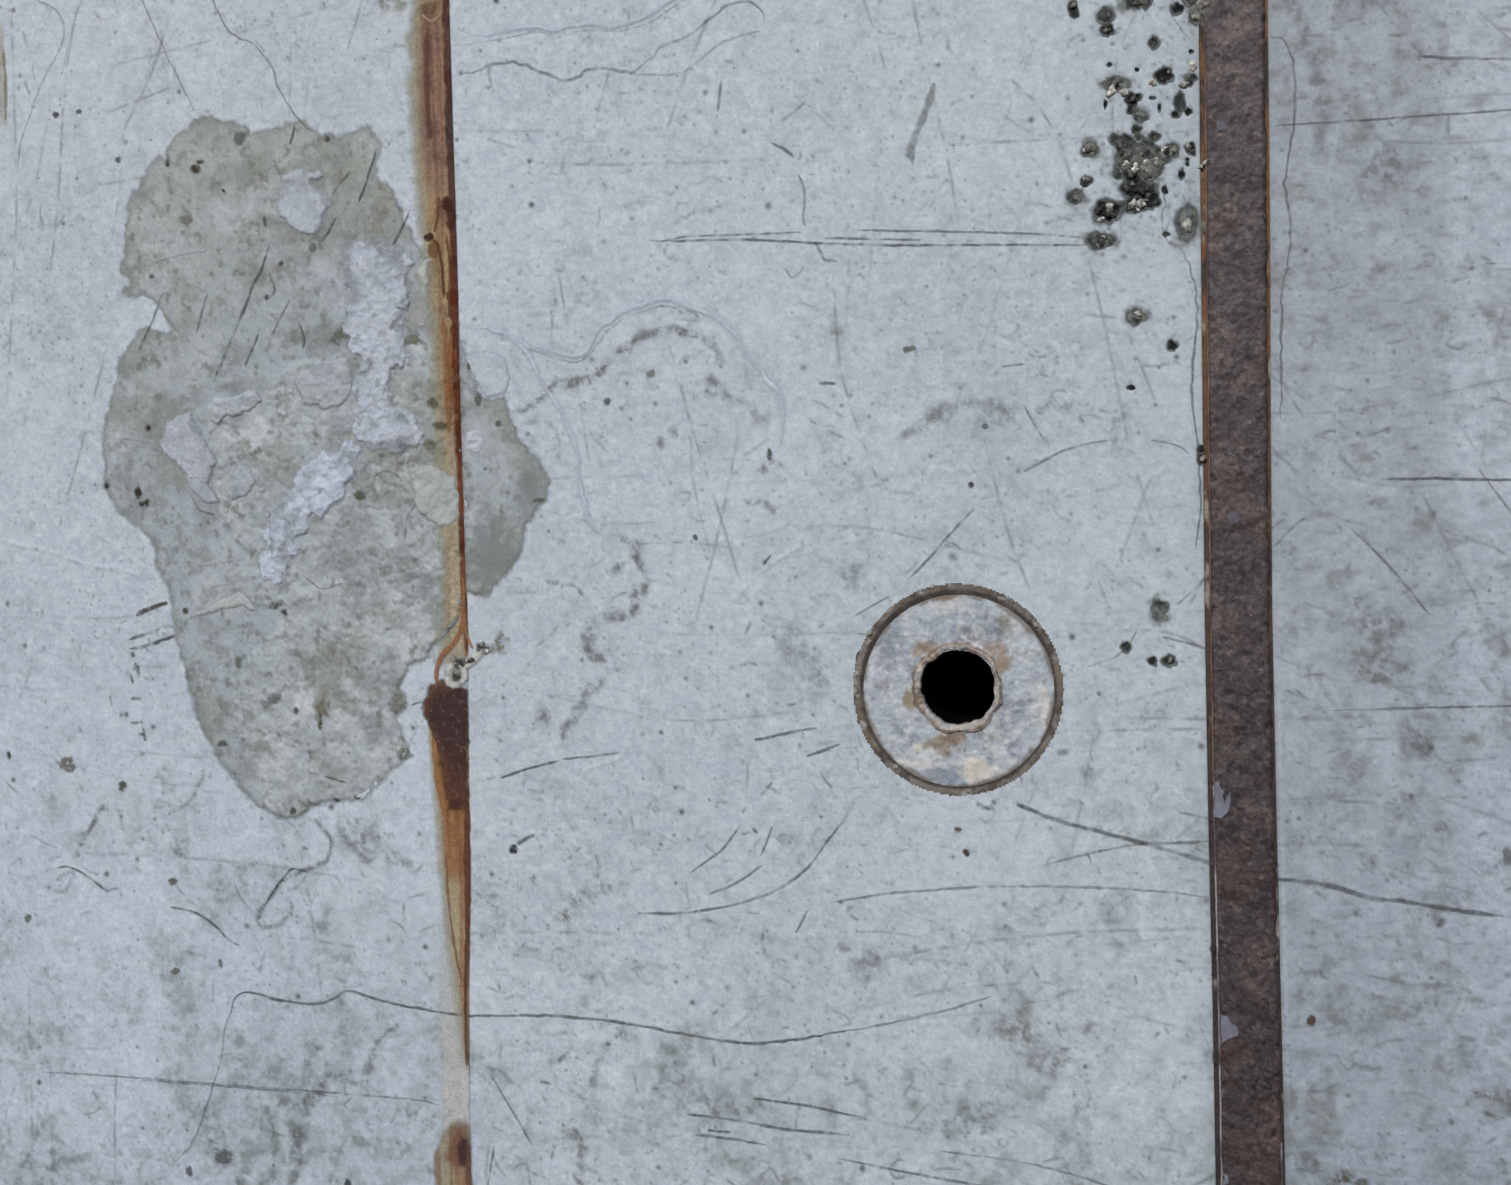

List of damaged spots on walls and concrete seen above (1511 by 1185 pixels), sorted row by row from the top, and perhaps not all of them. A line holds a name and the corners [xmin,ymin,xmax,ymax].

peeling [103,116,550,819]
rust [409,0,473,1065]
rust [434,1123,471,1185]